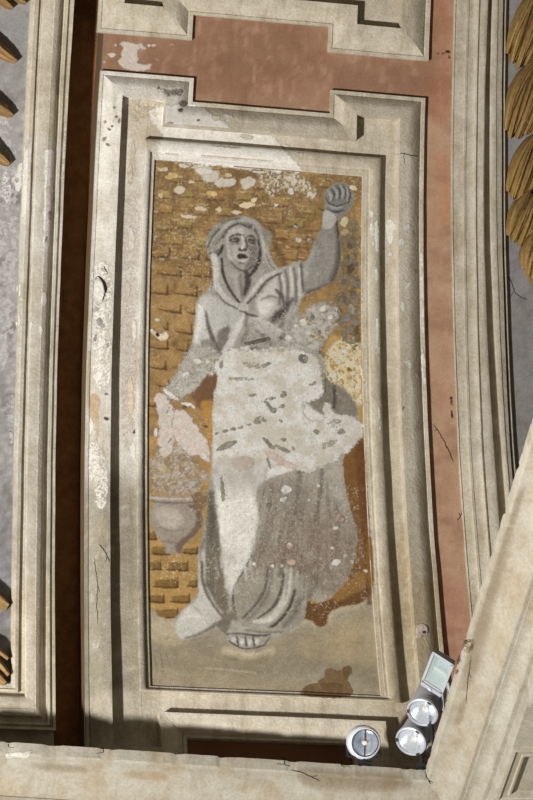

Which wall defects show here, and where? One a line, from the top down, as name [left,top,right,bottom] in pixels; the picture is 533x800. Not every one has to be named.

peeling [103,41,158,71]
peeling [127,87,318,207]
peeling [181,198,257,219]
crack [95,266,108,301]
peeling [149,301,366,584]
damp [355,444,373,604]
crack [94,544,109,622]
damp [301,666,353,699]